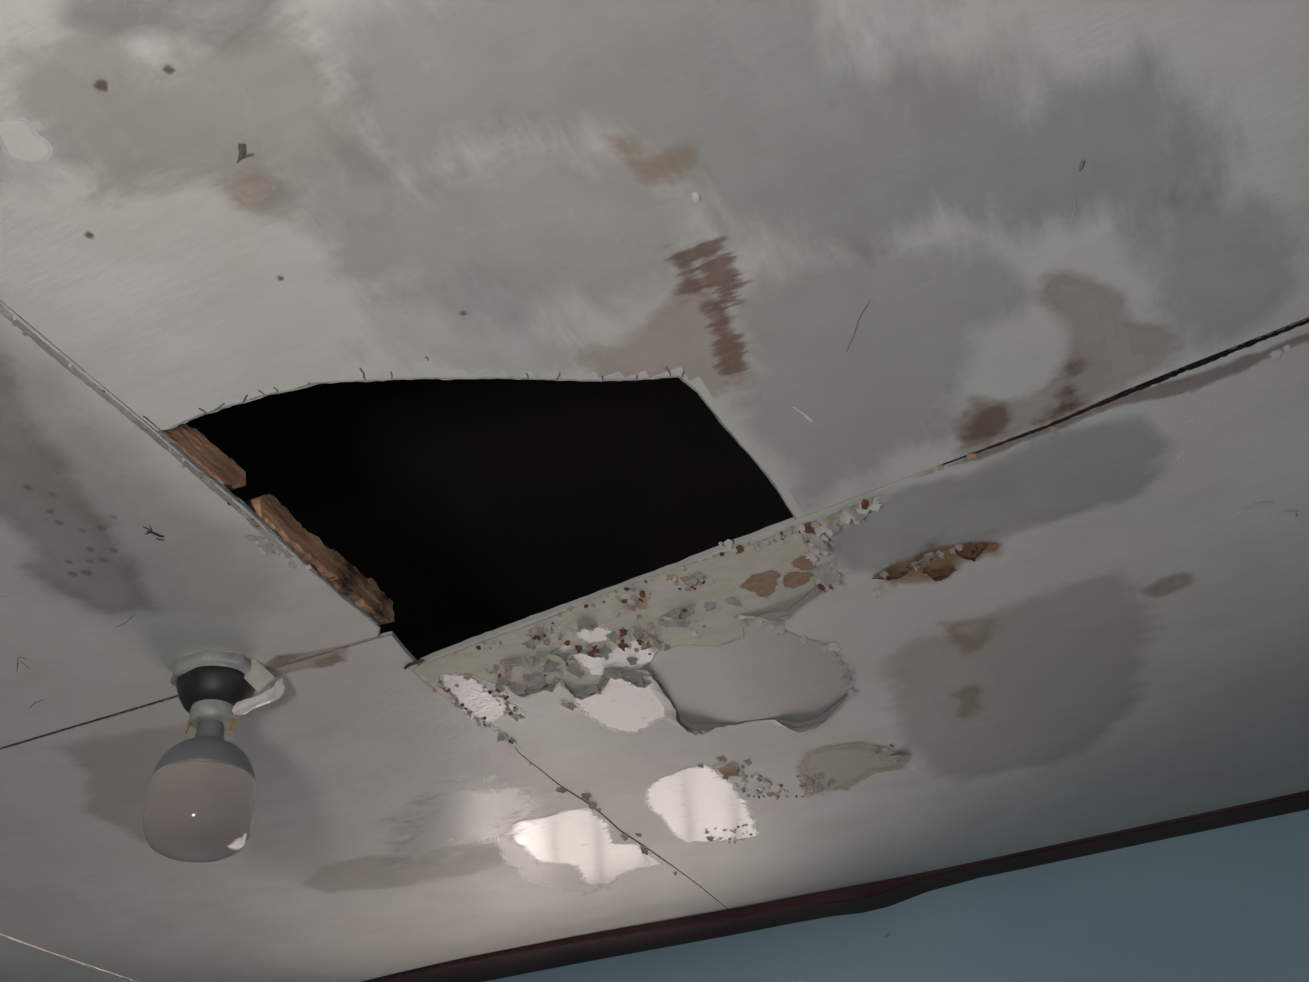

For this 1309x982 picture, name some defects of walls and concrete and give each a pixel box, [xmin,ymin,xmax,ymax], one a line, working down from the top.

rust [672,240,744,382]
rust [961,407,1014,441]
peeling [870,542,999,598]
peeling [412,496,883,743]
peeling [696,755,797,800]
peeling [703,824,752,843]